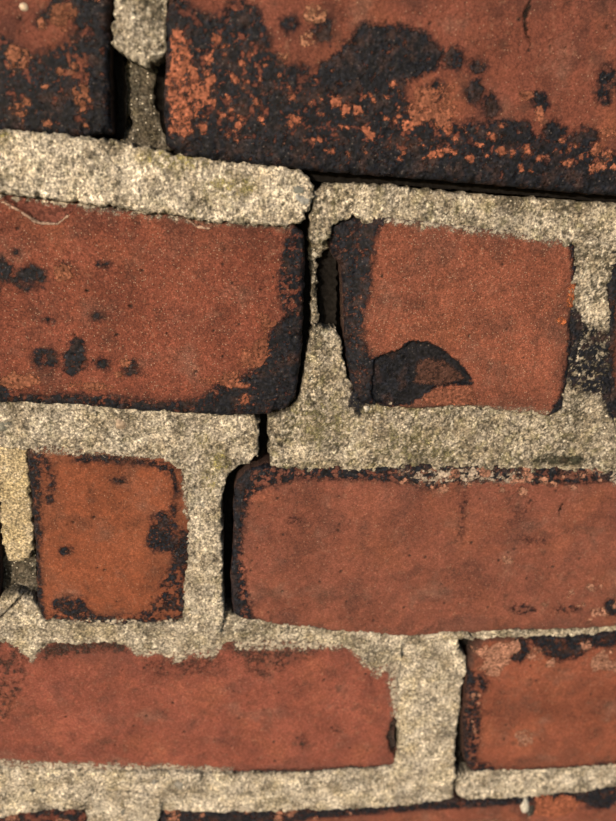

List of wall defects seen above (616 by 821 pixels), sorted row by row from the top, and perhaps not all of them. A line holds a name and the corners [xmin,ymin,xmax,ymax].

crack [523,0,531,46]
crack [296,212,338,393]
crack [222,414,268,599]
peeling [577,595,616,621]
crack [458,638,468,651]
crack [454,709,465,765]